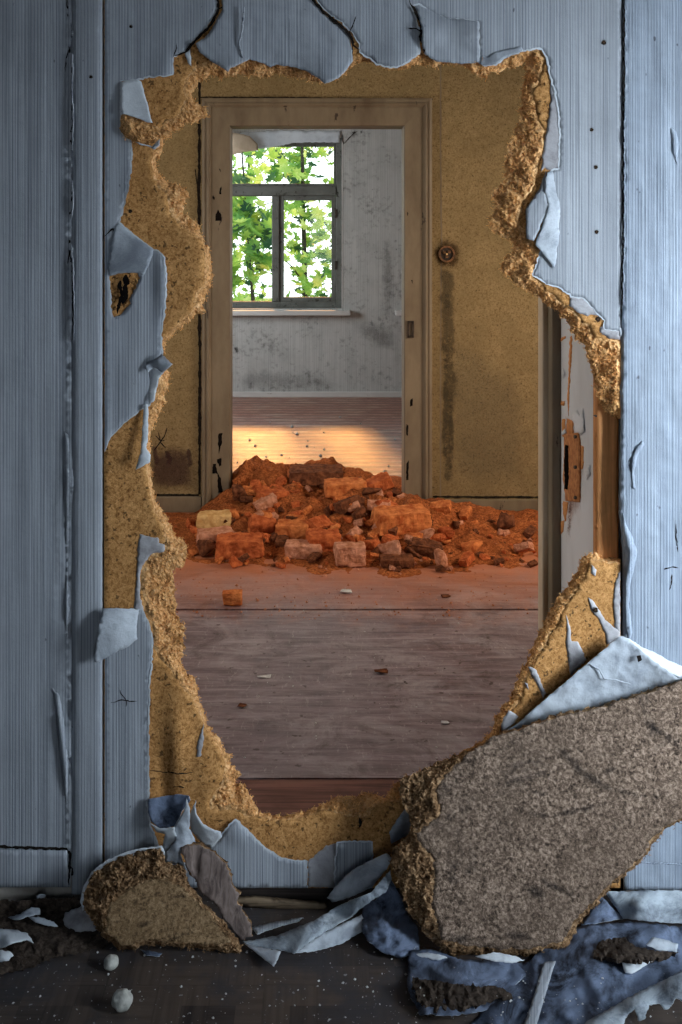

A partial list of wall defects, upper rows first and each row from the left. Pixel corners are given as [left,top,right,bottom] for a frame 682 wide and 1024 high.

crack [312,0,358,55]
spalling [110,273,138,316]
damp [440,271,455,480]
damp [153,447,192,486]
spalling [141,49,682,957]